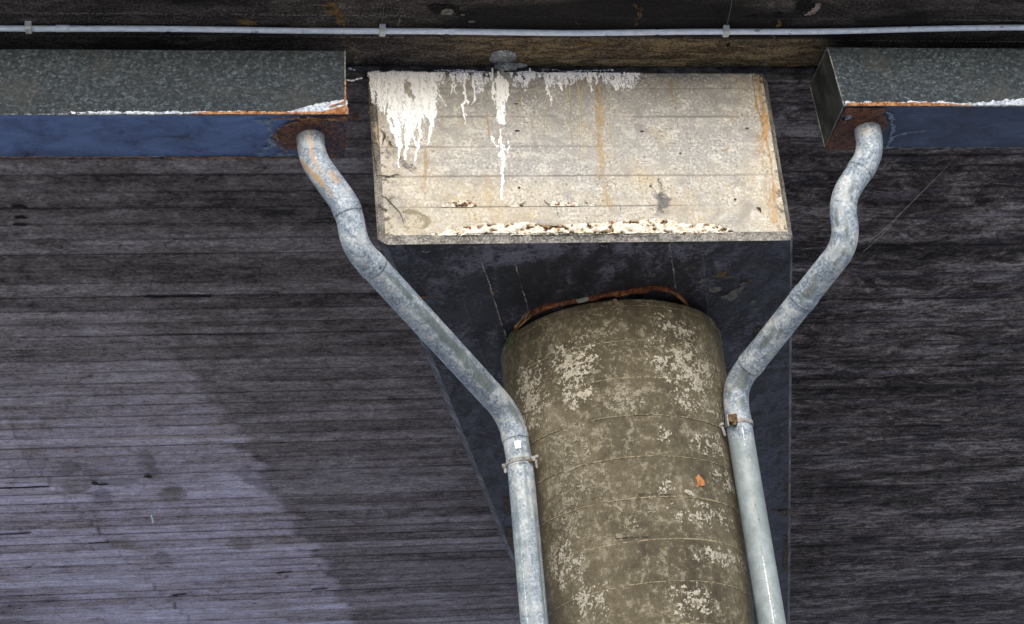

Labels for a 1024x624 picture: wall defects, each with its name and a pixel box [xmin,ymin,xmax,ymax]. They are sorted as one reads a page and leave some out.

rust [66,81,359,159]
damp [347,68,640,200]
rust [824,98,1024,150]
peeling [516,299,737,622]
spalling [505,528,514,549]
peeling [693,543,745,572]